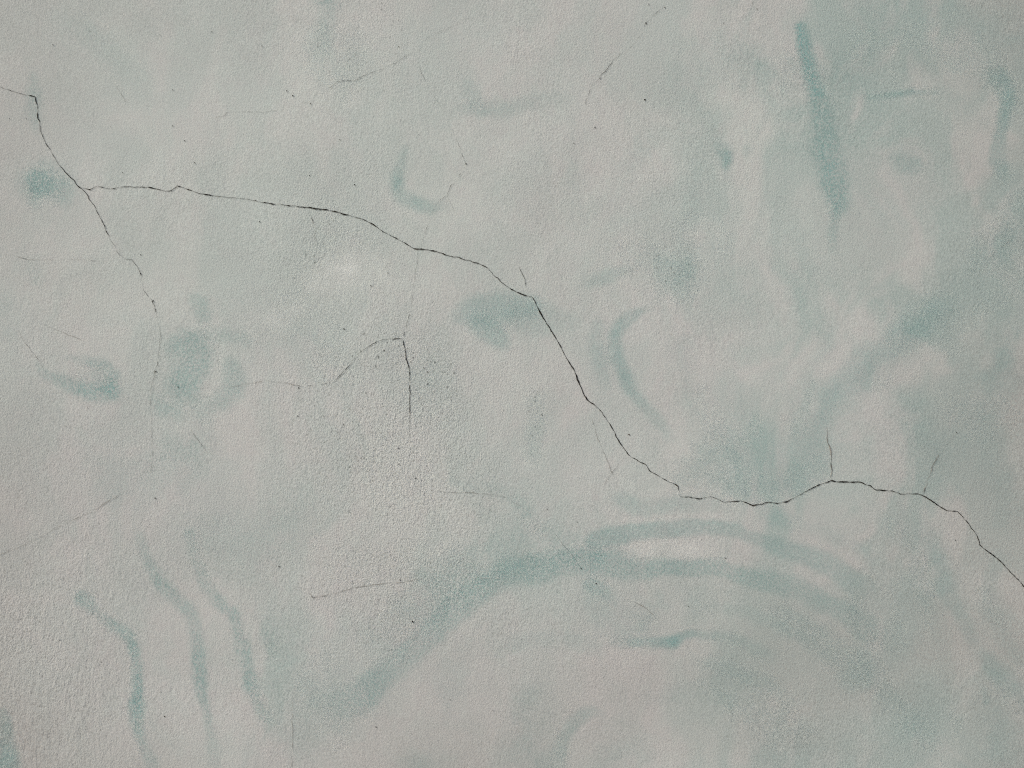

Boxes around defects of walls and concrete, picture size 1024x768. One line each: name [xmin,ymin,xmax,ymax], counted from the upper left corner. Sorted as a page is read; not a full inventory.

crack [6,89,1024,587]